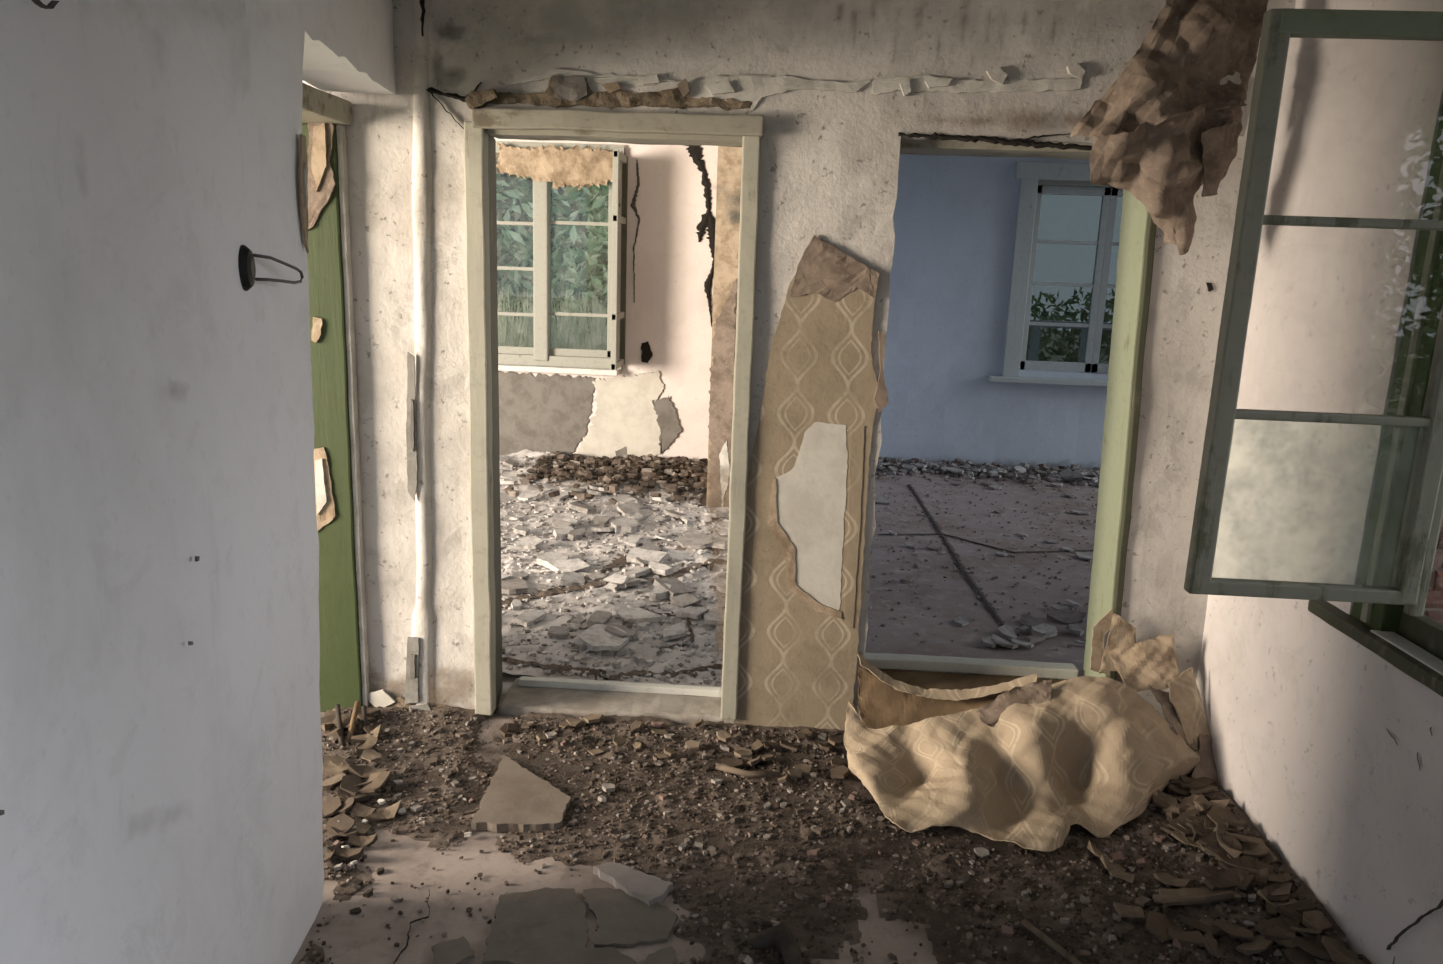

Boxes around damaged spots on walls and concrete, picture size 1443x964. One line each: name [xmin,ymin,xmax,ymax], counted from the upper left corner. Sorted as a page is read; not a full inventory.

peeling [299,122,336,253]
crack [684,145,716,327]
peeling [311,317,323,343]
spalling [498,341,681,458]
peeling [314,447,336,530]
peeling [768,422,848,619]
crack [394,890,430,964]
crack [1386,899,1443,950]